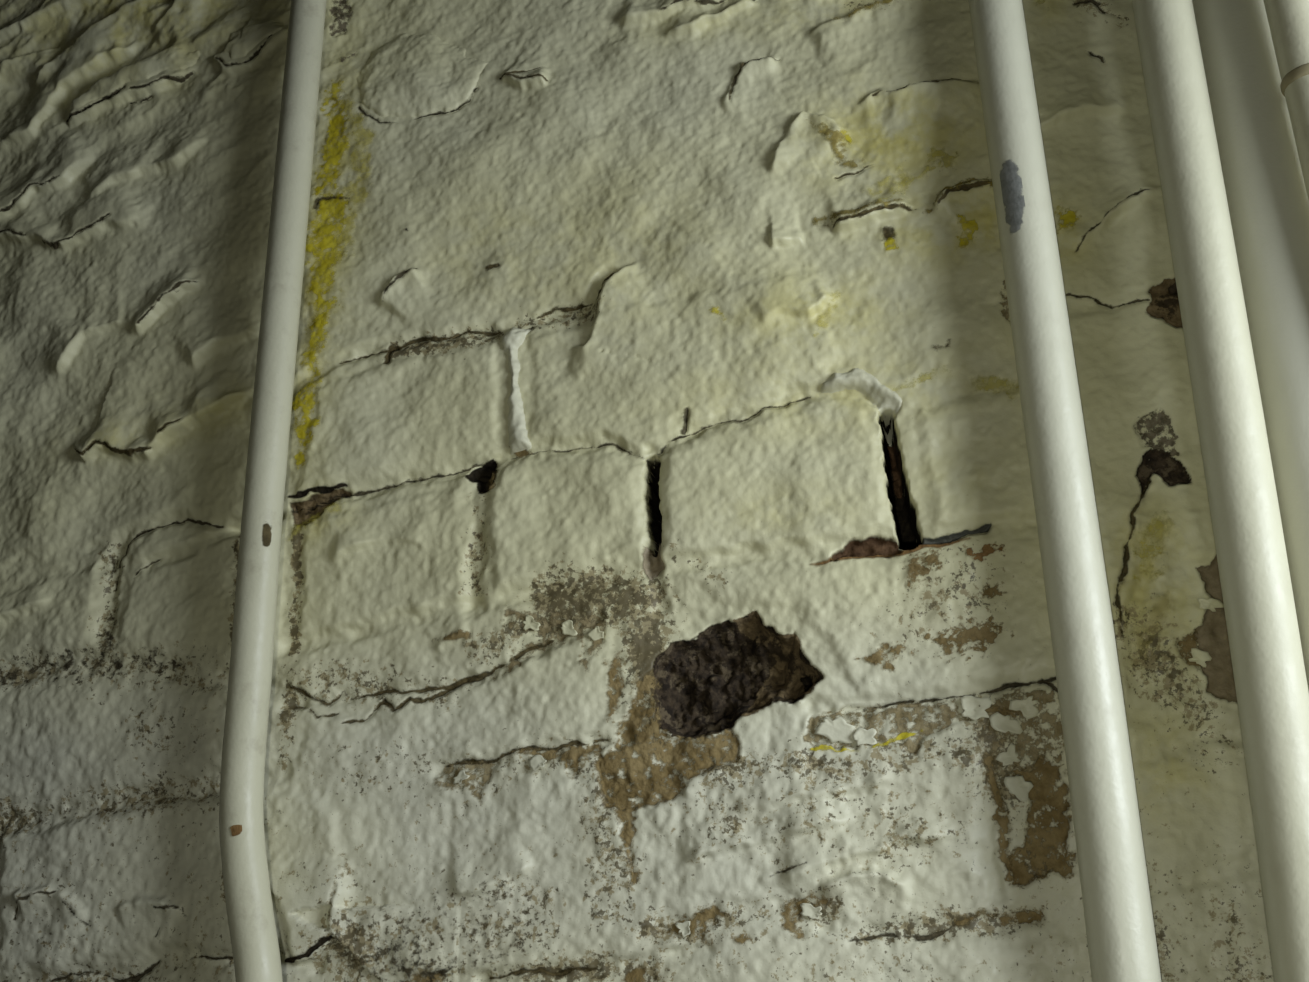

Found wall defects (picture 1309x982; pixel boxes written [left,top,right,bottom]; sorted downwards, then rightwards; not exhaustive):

leakage [330,0,353,36]
leakage [292,80,374,468]
spalling [1115,410,1192,634]
crack [289,640,554,724]
peeling [444,629,471,640]
peeling [435,759,498,806]
spalling [493,607,824,885]
spalling [803,688,1076,887]
spalling [1176,554,1237,702]